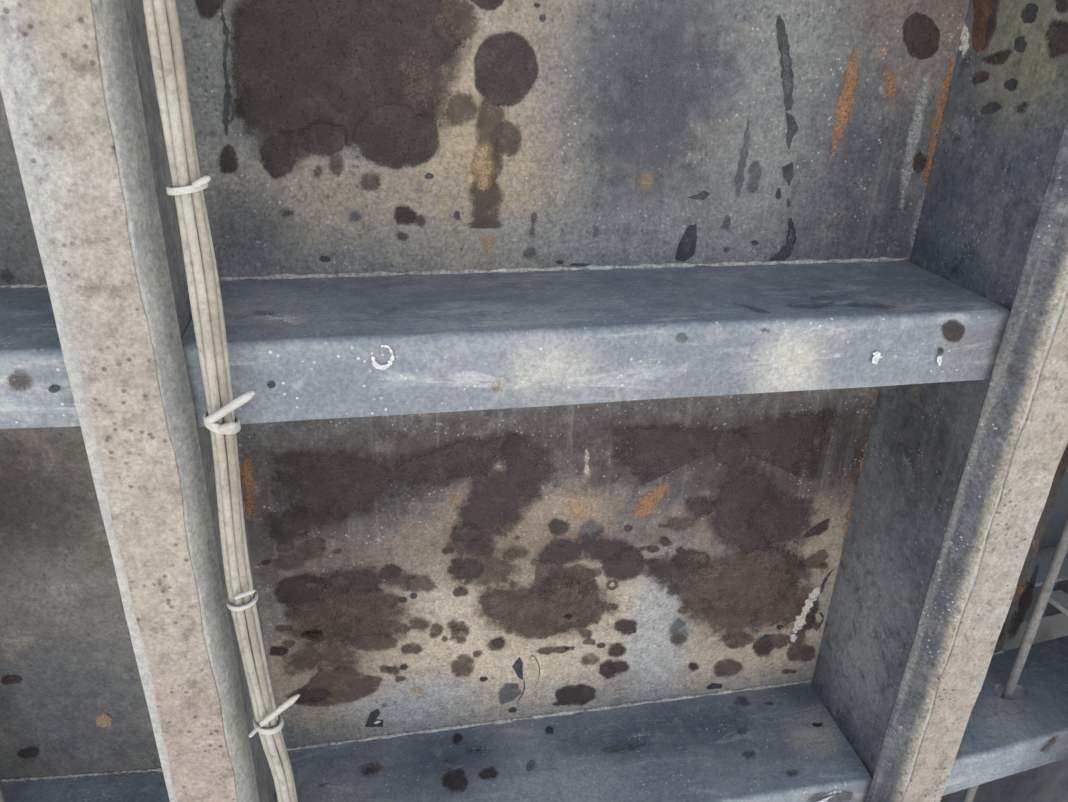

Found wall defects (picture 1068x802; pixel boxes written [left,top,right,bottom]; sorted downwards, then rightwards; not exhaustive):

leakage [1021,3,1039,23]
leakage [1045,0,1068,58]
leakage [972,36,1027,84]
leakage [196,0,538,190]
corrosion [832,49,858,156]
corrosion [924,58,954,187]
leakage [980,101,1001,114]
leakage [1004,78,1018,92]
leakage [394,206,425,241]
corrosion [634,485,666,517]
leakage [261,410,843,707]